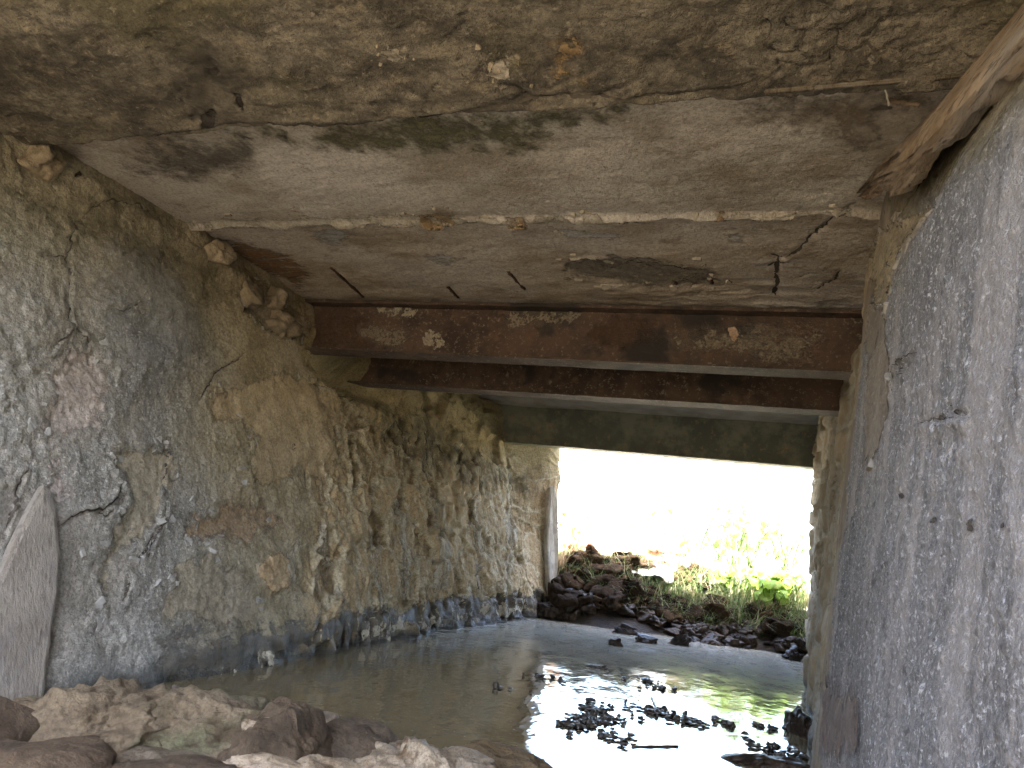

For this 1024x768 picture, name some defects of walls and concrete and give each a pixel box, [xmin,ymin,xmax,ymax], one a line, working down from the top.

crack [412,6,920,118]
crack [153,120,383,137]
damp [138,137,252,180]
spalling [177,210,636,231]
crack [767,201,858,295]
spalling [556,253,732,292]
damp [154,488,544,683]